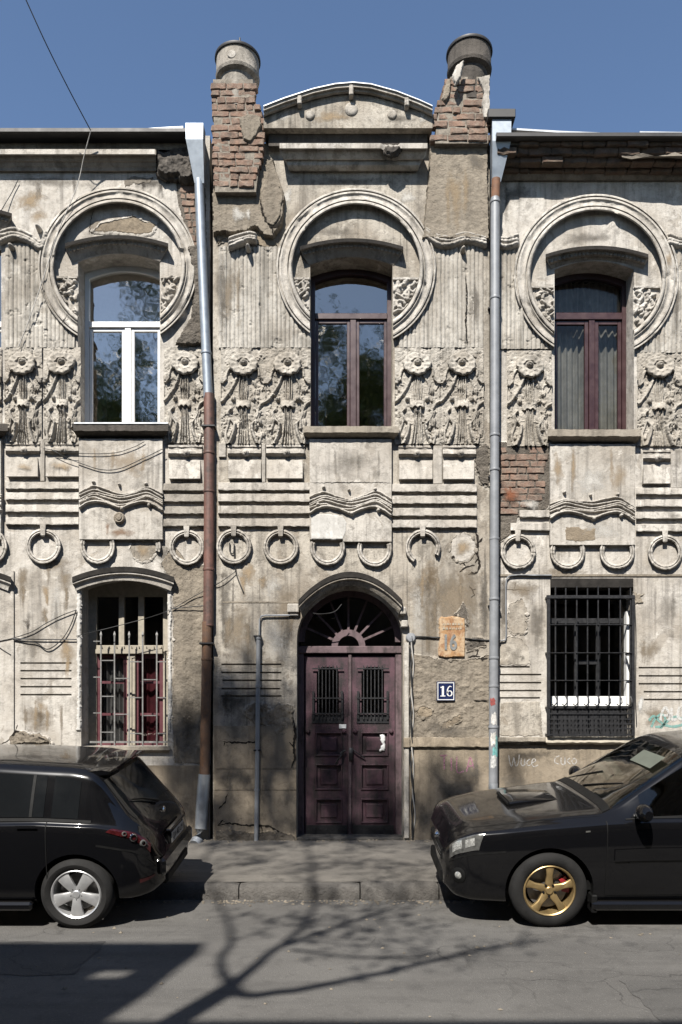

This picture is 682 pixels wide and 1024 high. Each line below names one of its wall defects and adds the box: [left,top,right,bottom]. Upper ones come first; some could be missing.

flaking render [429,60,491,146]
flaking render [175,83,283,348]
flaking render [473,440,549,544]
crack [223,739,255,747]
crack [289,717,297,768]
crack [217,794,287,835]